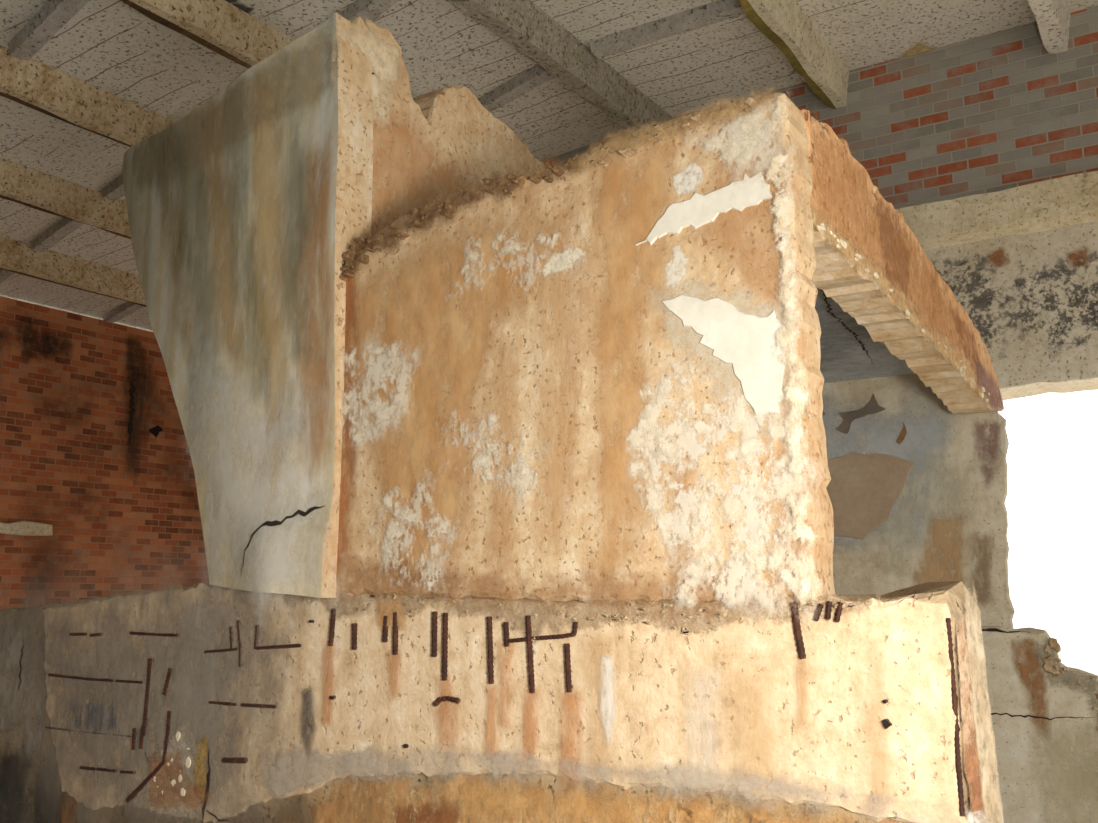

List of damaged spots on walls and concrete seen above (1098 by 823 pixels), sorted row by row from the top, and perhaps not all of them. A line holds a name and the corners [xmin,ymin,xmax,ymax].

crack [820,289,873,364]
damp [933,252,1098,352]
damp [0,129,317,823]
peeling [286,91,885,779]
flaking render [826,423,915,540]
crack [241,506,324,572]
crack [981,626,1031,634]
spalling [1037,638,1098,731]